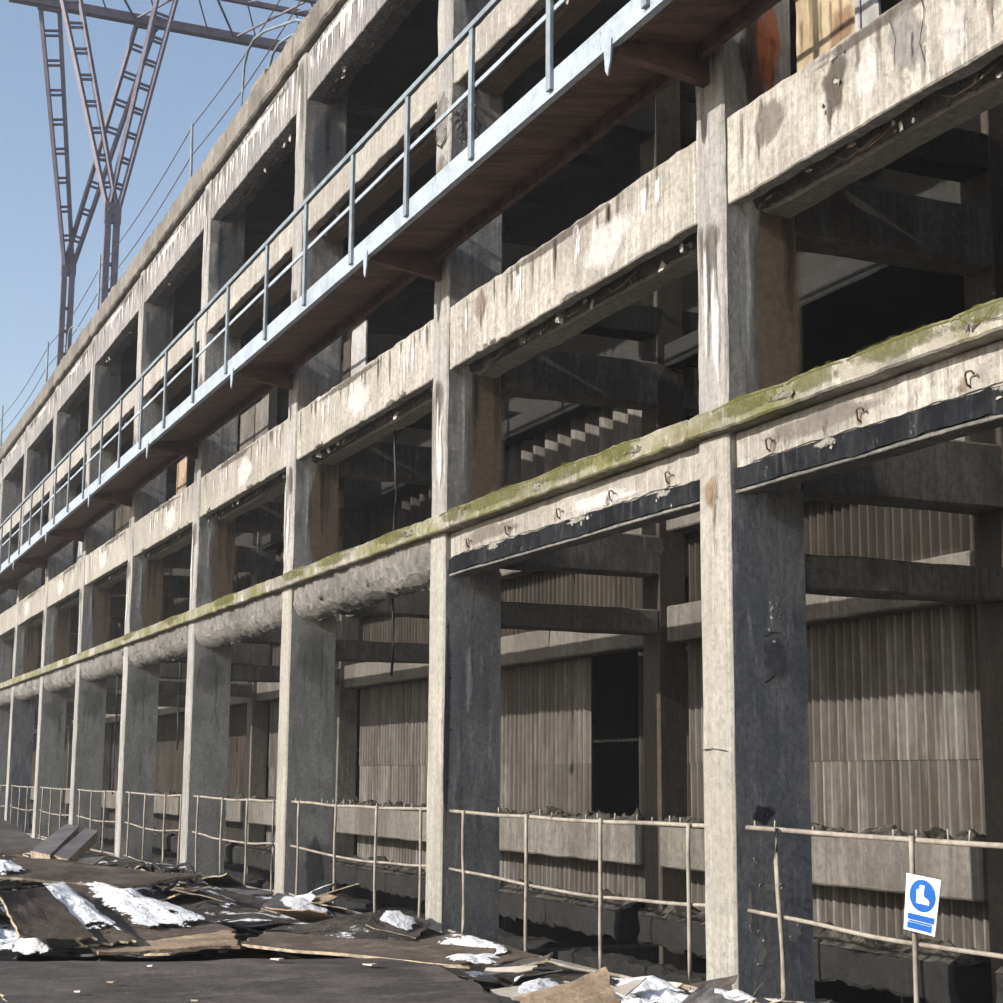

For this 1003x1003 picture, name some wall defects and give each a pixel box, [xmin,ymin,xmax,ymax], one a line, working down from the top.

rust [757,7,780,89]
spalling [753,49,1003,210]
water stain [0,0,367,497]
spalling [469,232,697,373]
water stain [698,225,718,363]
water stain [739,210,801,390]
water stain [300,326,428,433]
water stain [772,402,870,448]
water stain [13,587,110,674]
water stain [126,558,163,628]
water stain [191,518,236,601]